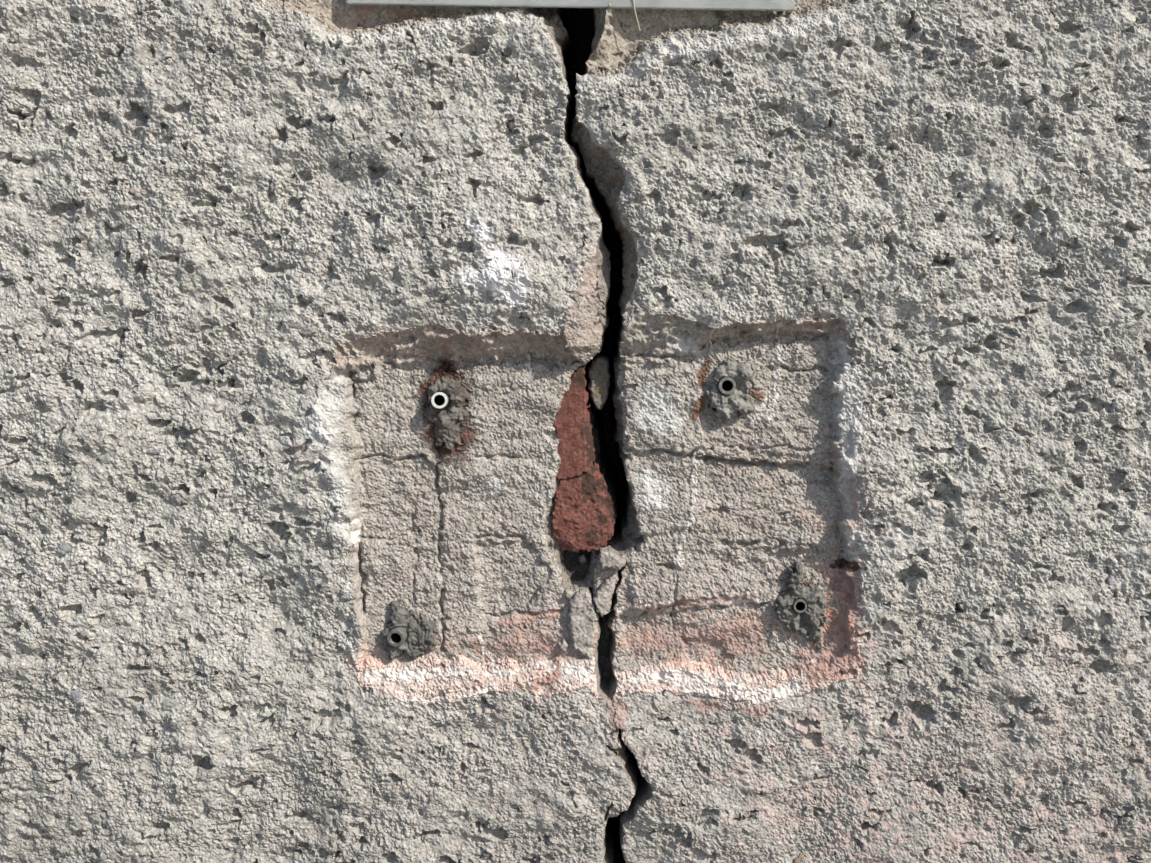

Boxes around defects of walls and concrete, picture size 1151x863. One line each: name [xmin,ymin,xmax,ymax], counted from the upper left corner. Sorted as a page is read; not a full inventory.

crack [346,371,359,419]
crack [343,448,527,669]
spalling [319,305,870,706]
crack [475,6,851,863]